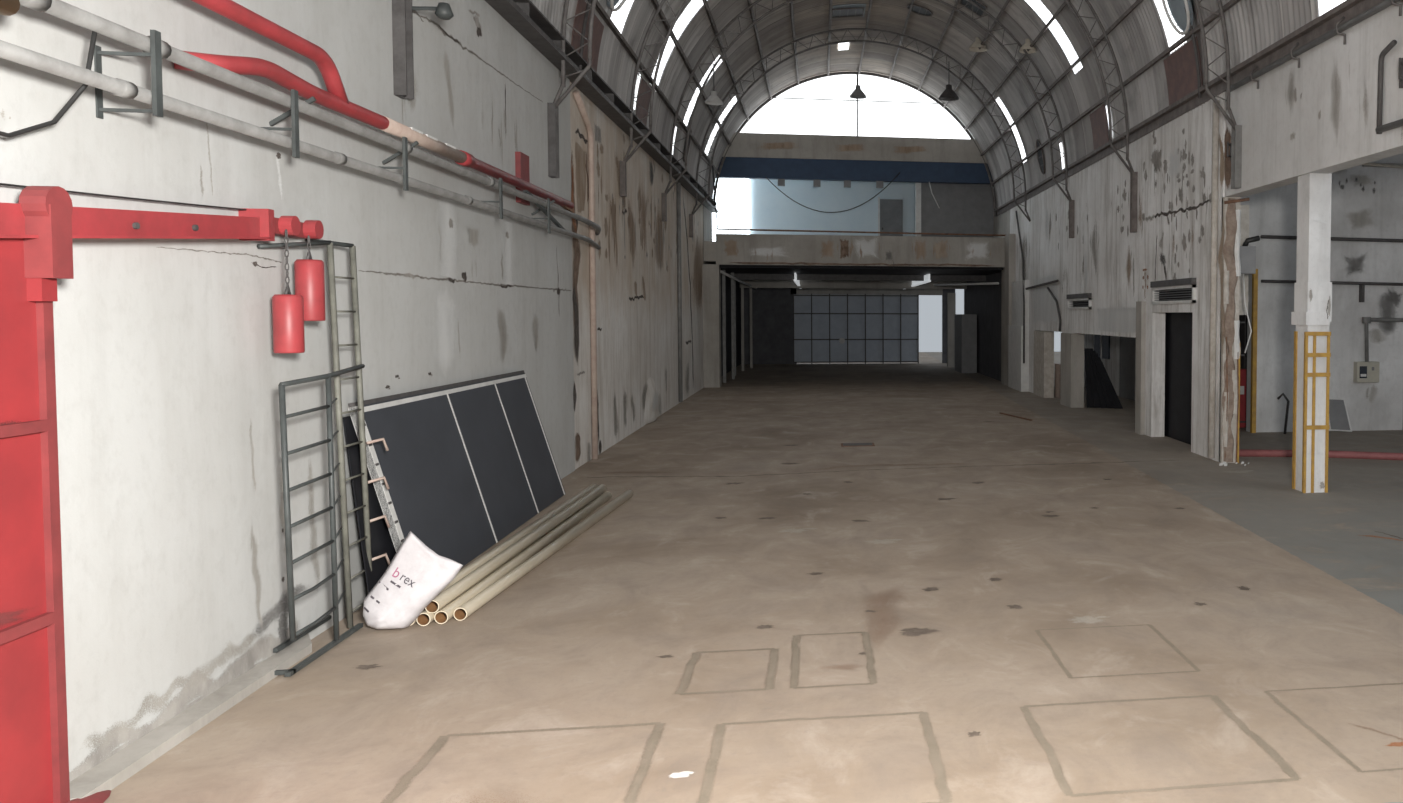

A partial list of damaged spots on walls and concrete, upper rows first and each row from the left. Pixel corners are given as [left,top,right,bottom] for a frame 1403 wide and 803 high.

damp [594,123,665,271]
damp [693,240,704,310]
damp [613,391,636,438]